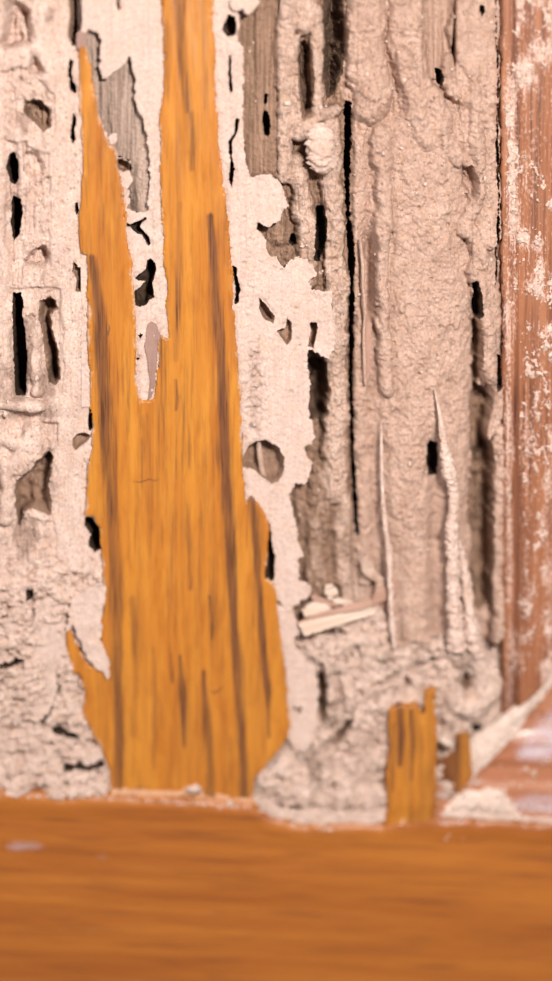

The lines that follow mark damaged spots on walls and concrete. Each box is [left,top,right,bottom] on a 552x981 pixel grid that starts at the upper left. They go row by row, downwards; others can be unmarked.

peeling [81,0,169,407]
peeling [212,0,337,752]
crack [343,101,360,535]
peeling [31,582,110,719]
peeling [383,686,473,826]